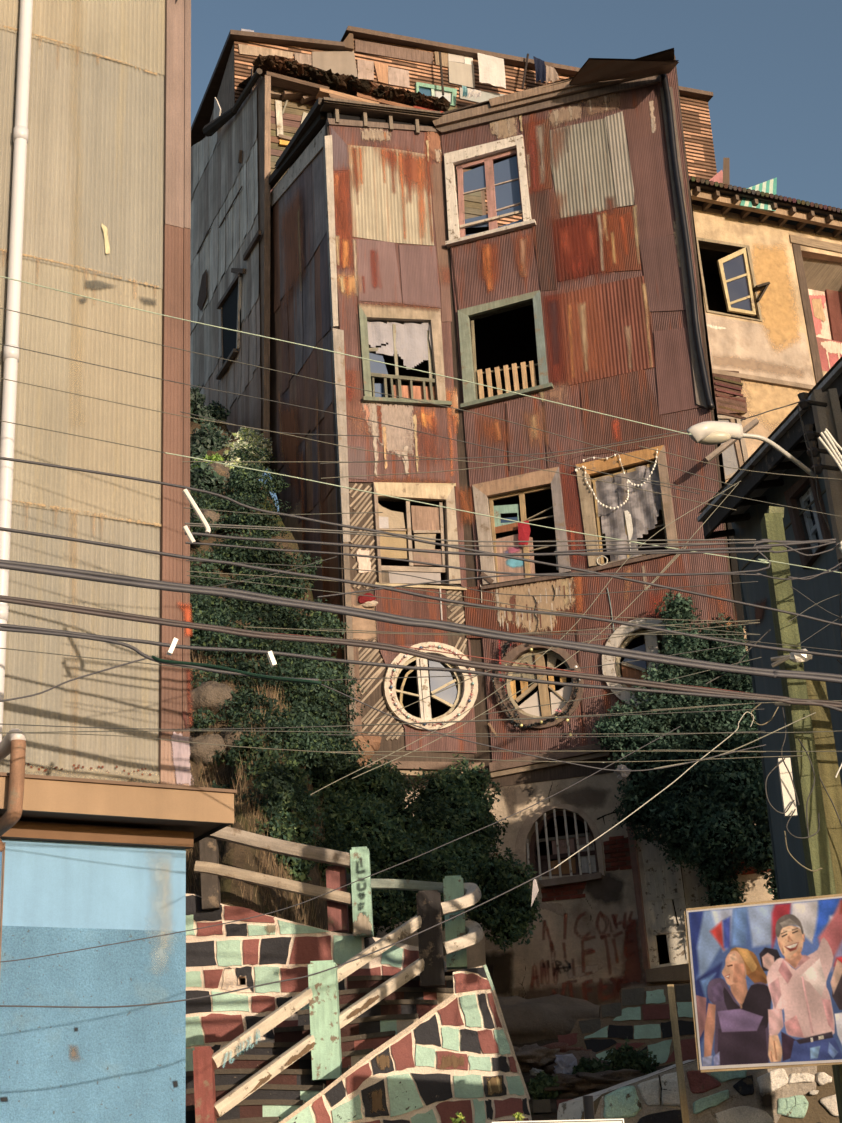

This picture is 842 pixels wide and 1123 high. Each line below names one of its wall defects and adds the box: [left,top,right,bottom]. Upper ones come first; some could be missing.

rust [381,147,433,238]
rust [482,244,496,289]
rust [559,198,638,276]
peeling [753,247,799,348]
peeling [809,294,842,368]
peeling [363,402,419,475]
rust [379,392,472,521]
peeling [492,577,576,634]
water stain [585,873,623,903]
spalling [603,835,632,871]